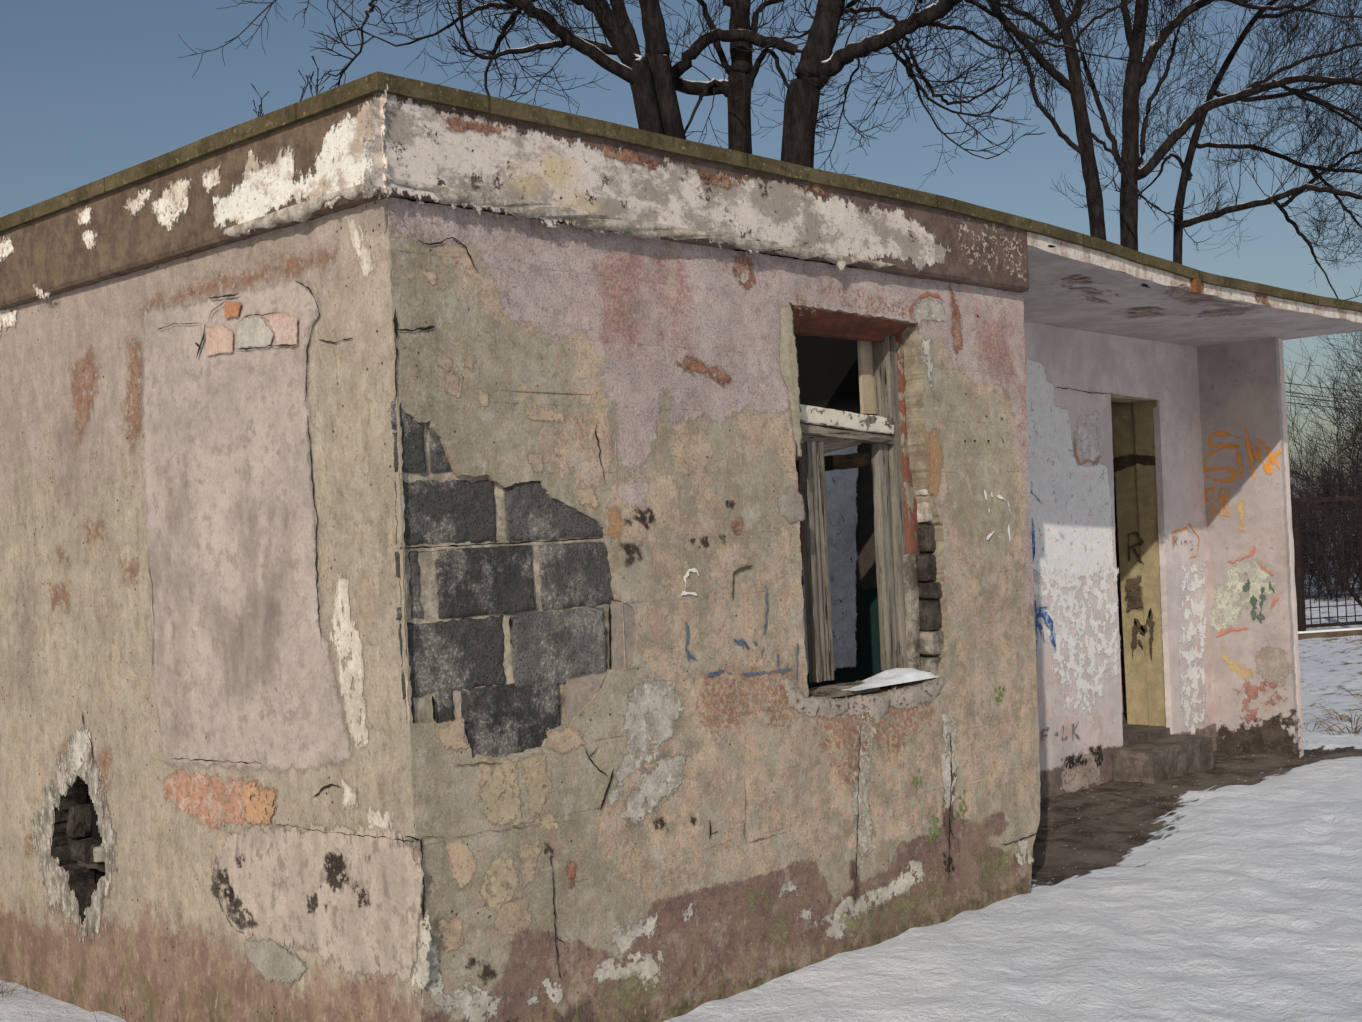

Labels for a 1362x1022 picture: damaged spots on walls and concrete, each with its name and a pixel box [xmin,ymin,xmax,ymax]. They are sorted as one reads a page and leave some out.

peeling [76,205,98,250]
peeling [123,163,221,231]
spalling [390,386,689,936]
spalling [30,721,118,944]
water stain [408,904,432,1001]
crack [280,742,614,919]
crack [550,856,565,978]
water stain [554,1001,593,1022]
peeling [777,860,925,941]
water stain [850,861,859,903]
crack [854,730,862,876]
crack [949,736,960,883]